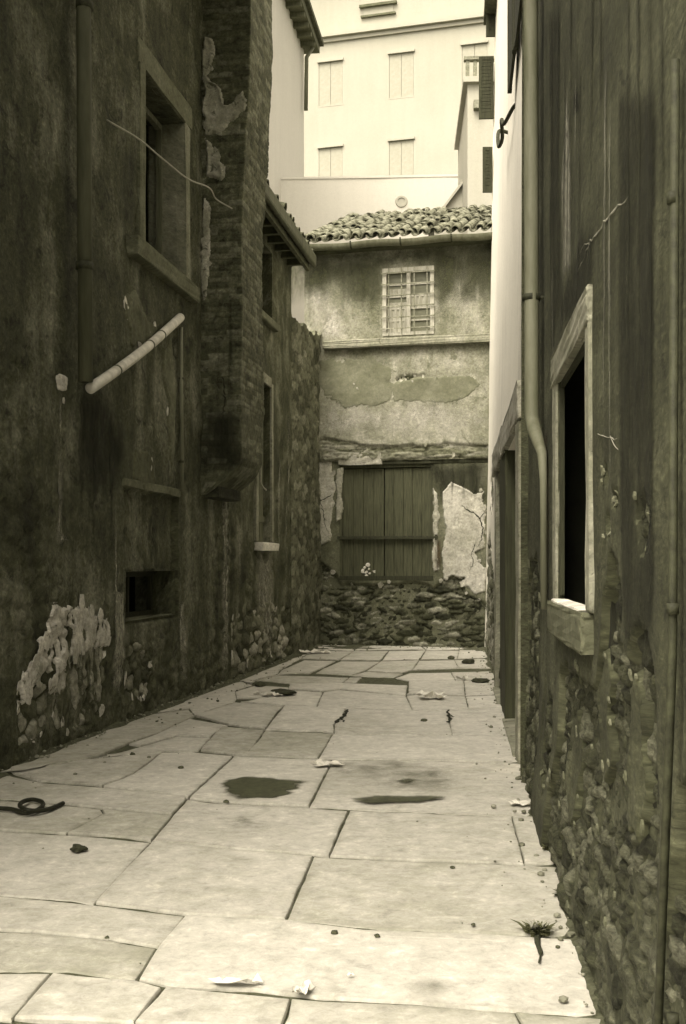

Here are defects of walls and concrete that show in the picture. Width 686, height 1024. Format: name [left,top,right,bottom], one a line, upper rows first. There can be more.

flaking render [202,37,247,181]
spalling [319,440,489,545]
spalling [319,481,500,689]
crack [463,506,486,567]
flaking render [16,594,111,745]